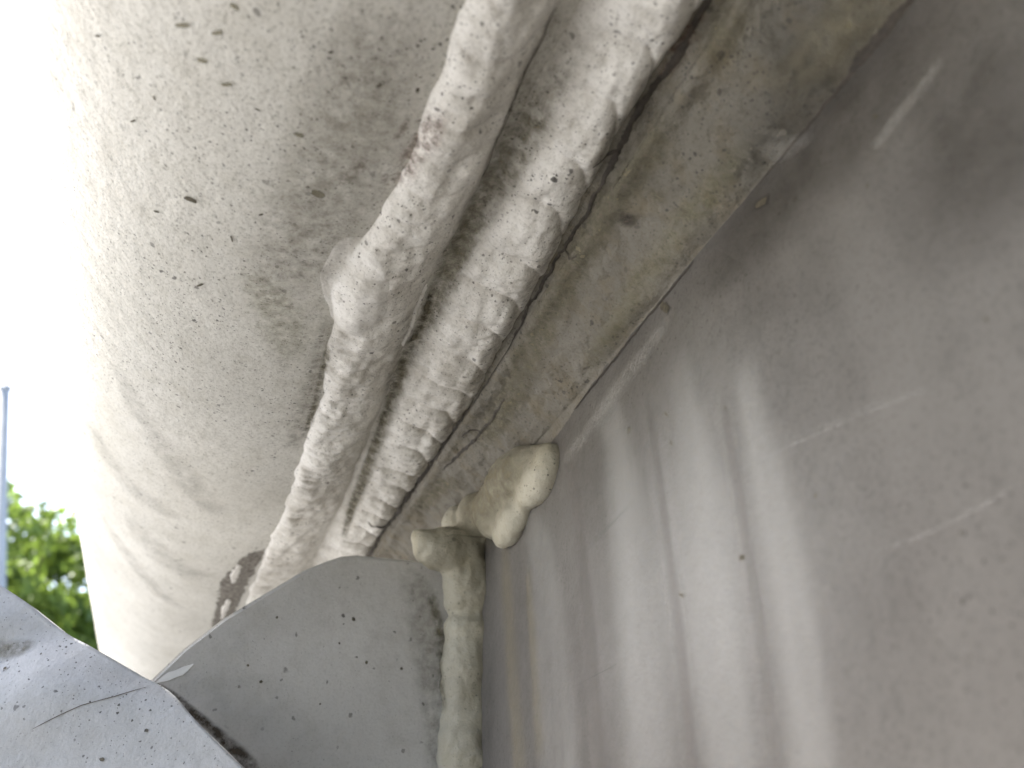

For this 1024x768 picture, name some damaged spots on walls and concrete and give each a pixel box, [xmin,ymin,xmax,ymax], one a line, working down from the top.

crack [759,0,915,184]
crack [367,0,712,557]
peeling [211,551,264,627]